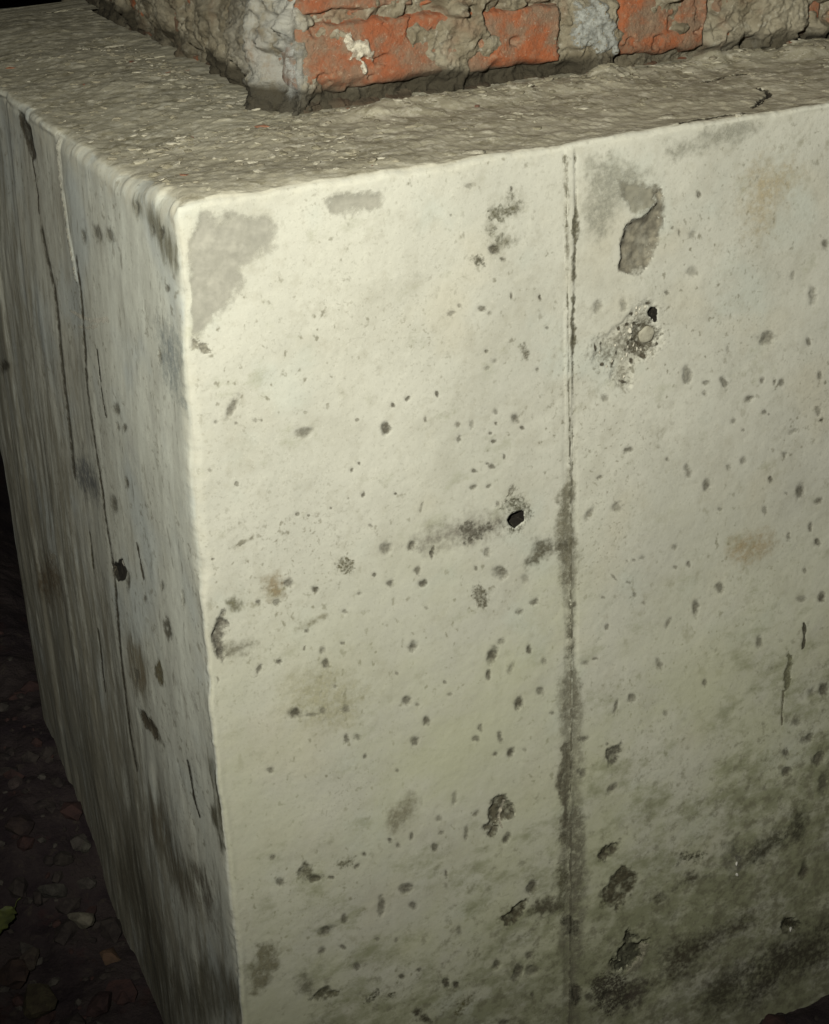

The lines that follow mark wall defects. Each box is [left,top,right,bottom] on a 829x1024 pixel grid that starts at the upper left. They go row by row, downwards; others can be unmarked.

spalling [618,188,664,274]
spalling [594,302,661,383]
damp [557,479,575,583]
spalling [483,794,514,837]
damp [535,743,582,936]
spalling [602,866,637,910]
damp [571,973,647,1016]
spalling [610,929,649,977]
damp [704,925,827,1009]